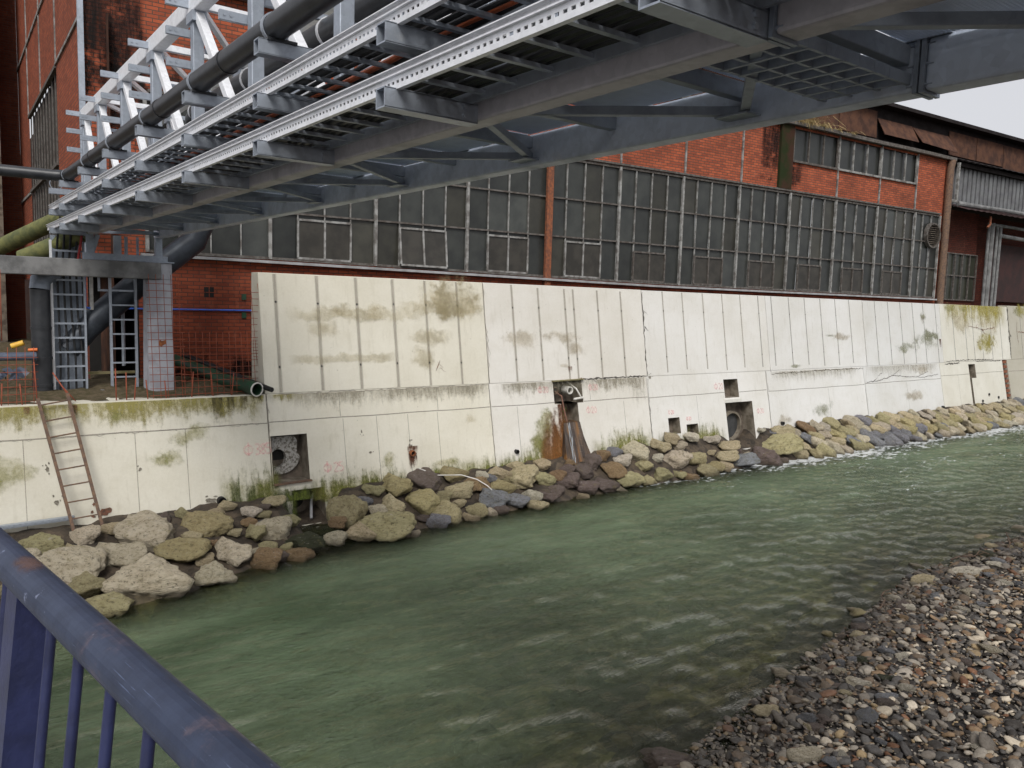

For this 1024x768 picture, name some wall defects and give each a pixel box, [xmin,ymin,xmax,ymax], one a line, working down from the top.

crack [766,303,1024,423]
damp [0,406,38,419]
damp [106,394,292,421]
corrosion [543,404,566,459]
damp [232,479,378,516]